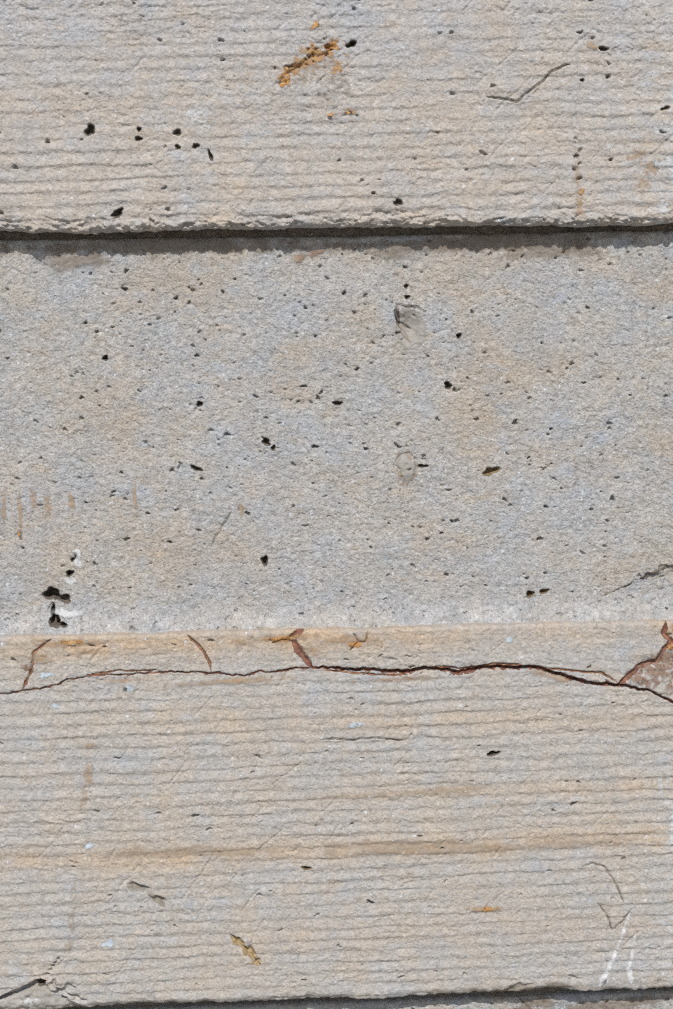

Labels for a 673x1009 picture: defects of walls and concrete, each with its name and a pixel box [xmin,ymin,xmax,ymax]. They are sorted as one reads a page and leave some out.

rust [278,38,348,87]
crack [0,620,673,703]